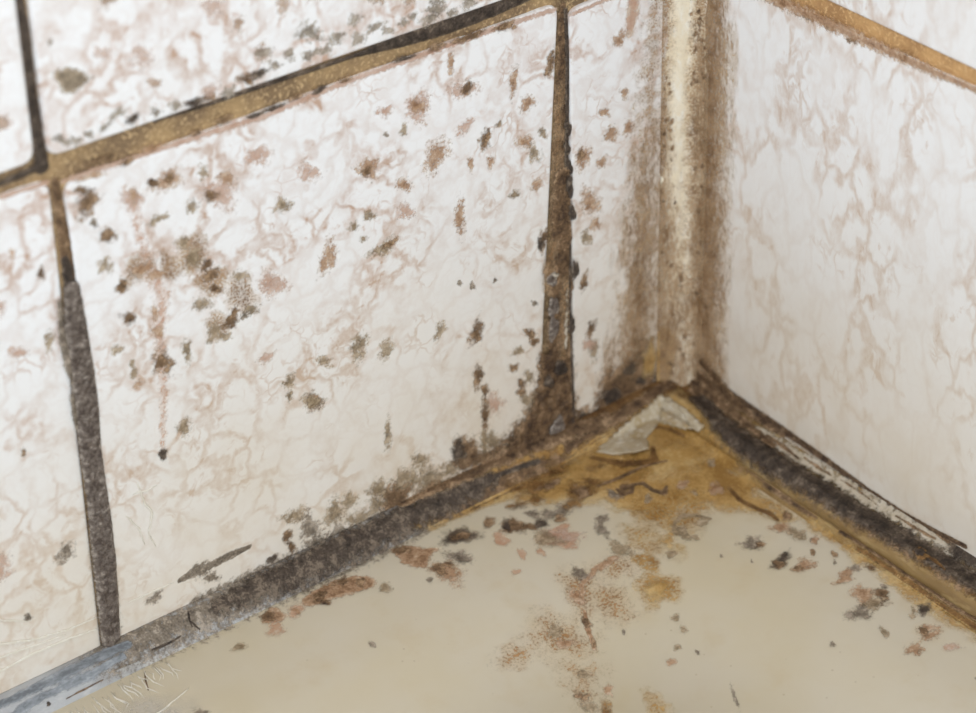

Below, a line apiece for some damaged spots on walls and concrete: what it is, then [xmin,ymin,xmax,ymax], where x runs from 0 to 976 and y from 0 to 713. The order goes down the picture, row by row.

leakage [0,0,93,186]
leakage [152,0,477,119]
leakage [428,20,517,97]
leakage [518,2,606,215]
leakage [74,144,162,241]
leakage [148,166,180,189]
leakage [116,233,286,342]
peeling [597,394,704,455]
leakage [178,544,252,583]
leakage [443,529,482,544]
leakage [530,515,680,657]
leakage [832,544,966,629]